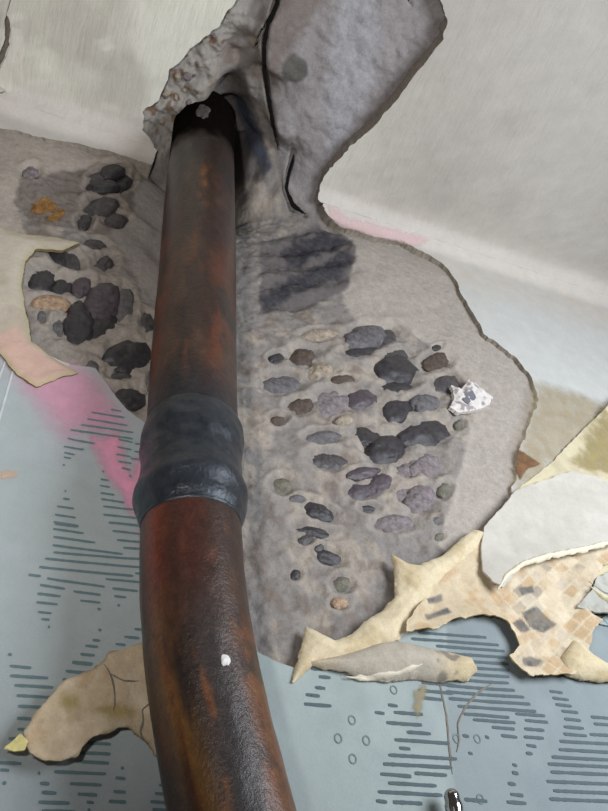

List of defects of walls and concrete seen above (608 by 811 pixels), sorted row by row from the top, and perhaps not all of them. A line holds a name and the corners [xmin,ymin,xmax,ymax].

crack [0,0,23,94]
crack [255,0,306,214]
water stain [283,55,307,82]
rust [31,197,65,221]
water stain [262,234,350,308]
spalling [0,0,536,668]